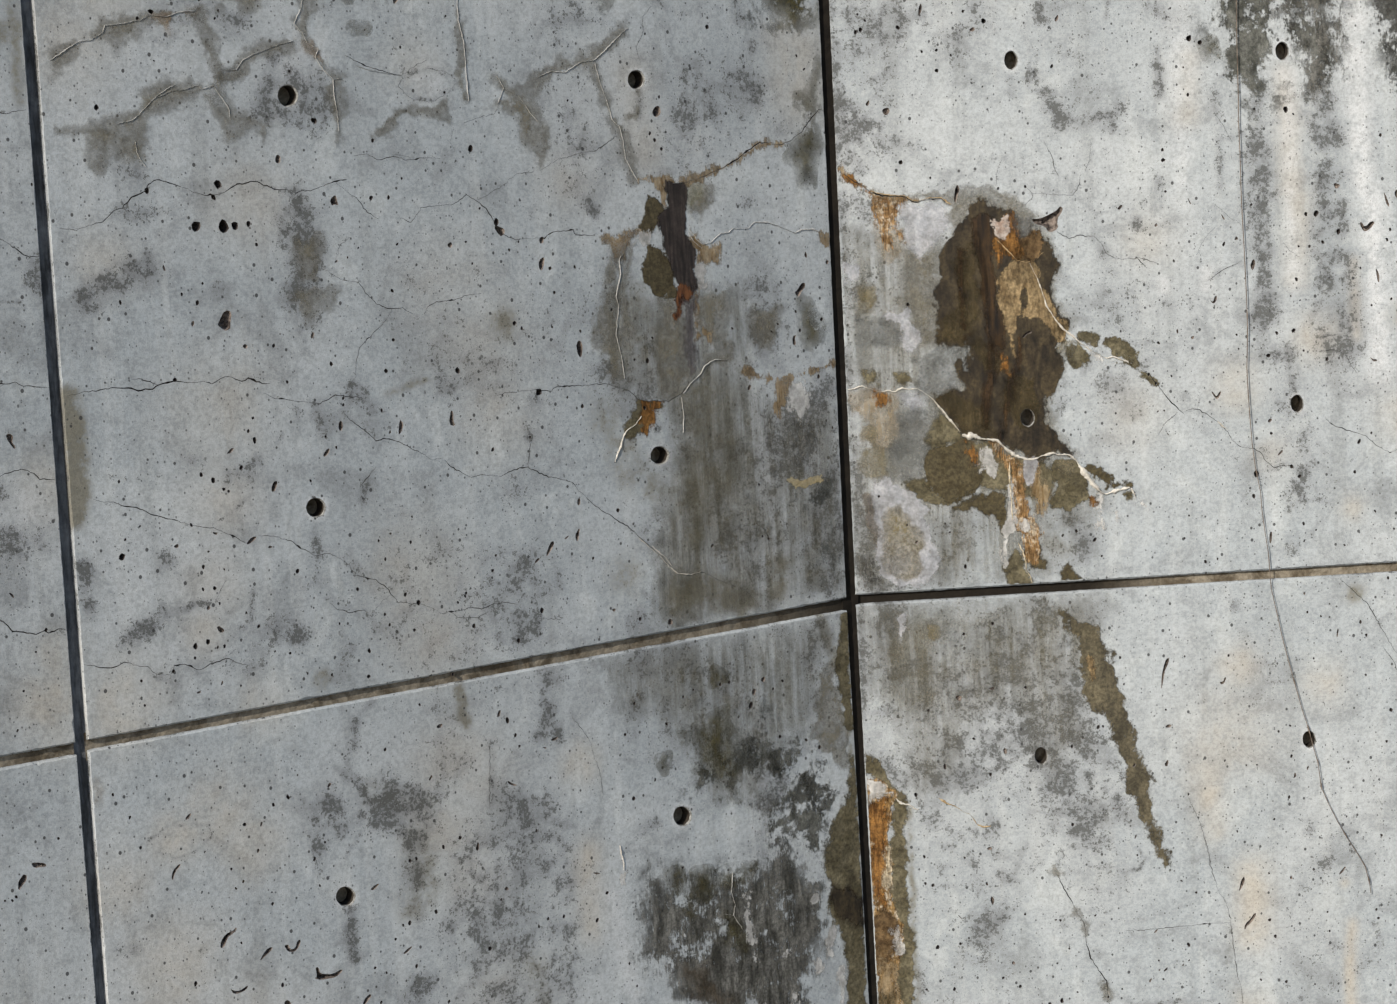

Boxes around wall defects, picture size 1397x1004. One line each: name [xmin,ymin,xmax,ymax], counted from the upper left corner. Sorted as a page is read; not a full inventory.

water stain [1208,0,1347,113]
water stain [1371,0,1397,86]
crack [61,102,634,240]
crack [672,109,821,184]
rust [838,166,919,257]
spalling [1032,207,1063,232]
crack [0,241,759,618]
water stain [842,190,1159,589]
crack [0,620,62,635]
water stain [973,598,1172,868]
water stain [620,612,918,1004]
rust [867,778,905,1004]